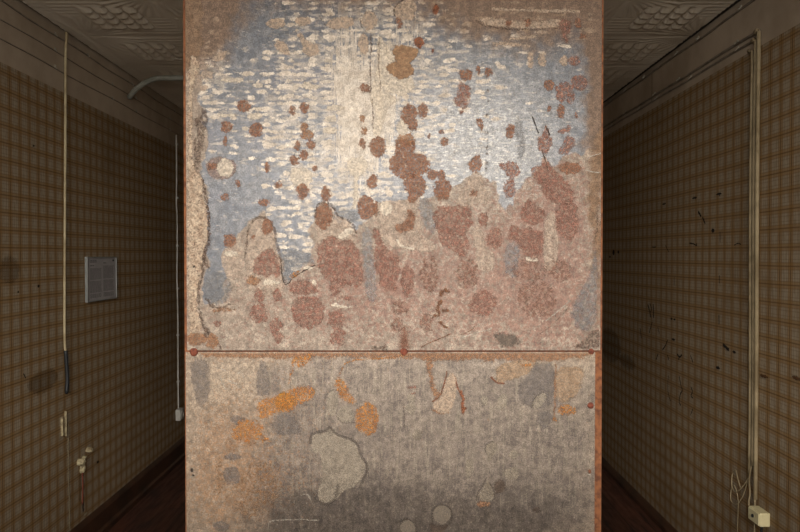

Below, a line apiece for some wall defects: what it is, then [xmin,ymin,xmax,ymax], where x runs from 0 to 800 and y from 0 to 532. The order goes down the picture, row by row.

corrosion [290,102,316,165]
corrosion [531,56,587,240]
peeling [186,51,243,335]
peeling [221,216,284,296]
peeling [315,202,357,257]
corrosion [357,103,571,317]
corrosion [187,228,600,446]
peeling [432,371,457,413]
water stain [495,360,584,428]
water stain [312,429,366,503]
water stain [477,450,519,507]
water stain [430,505,451,532]